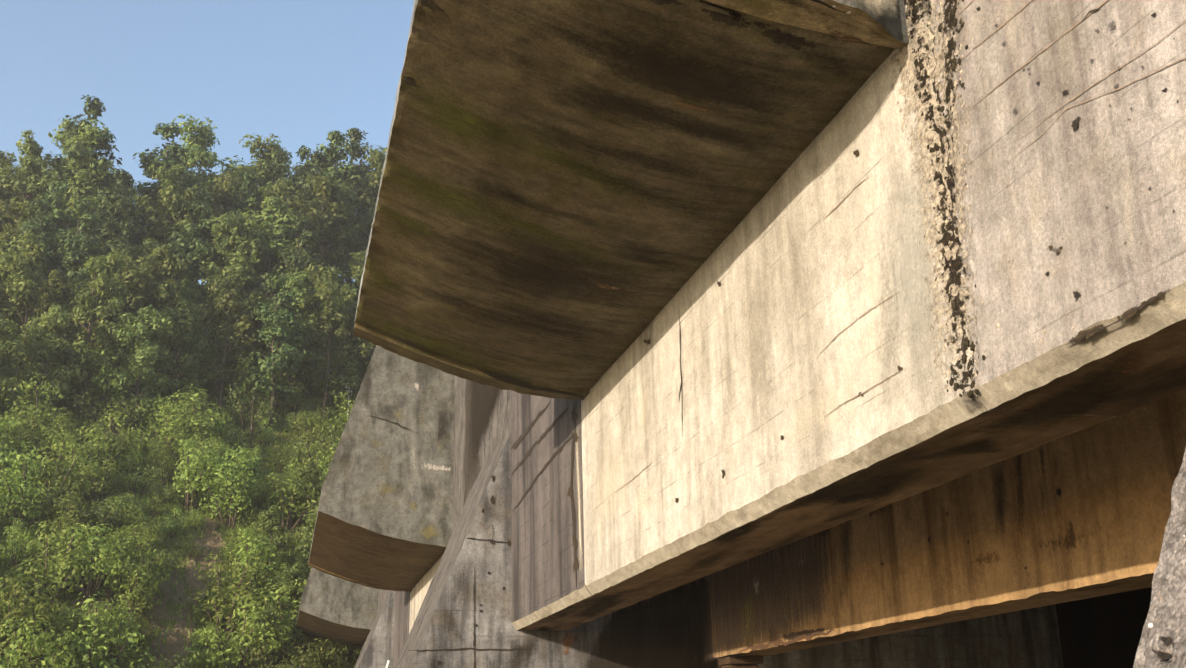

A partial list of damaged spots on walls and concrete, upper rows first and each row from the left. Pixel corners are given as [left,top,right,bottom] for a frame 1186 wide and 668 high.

leakage [566,87,760,154]
crack [676,302,684,397]
crack [372,416,417,433]